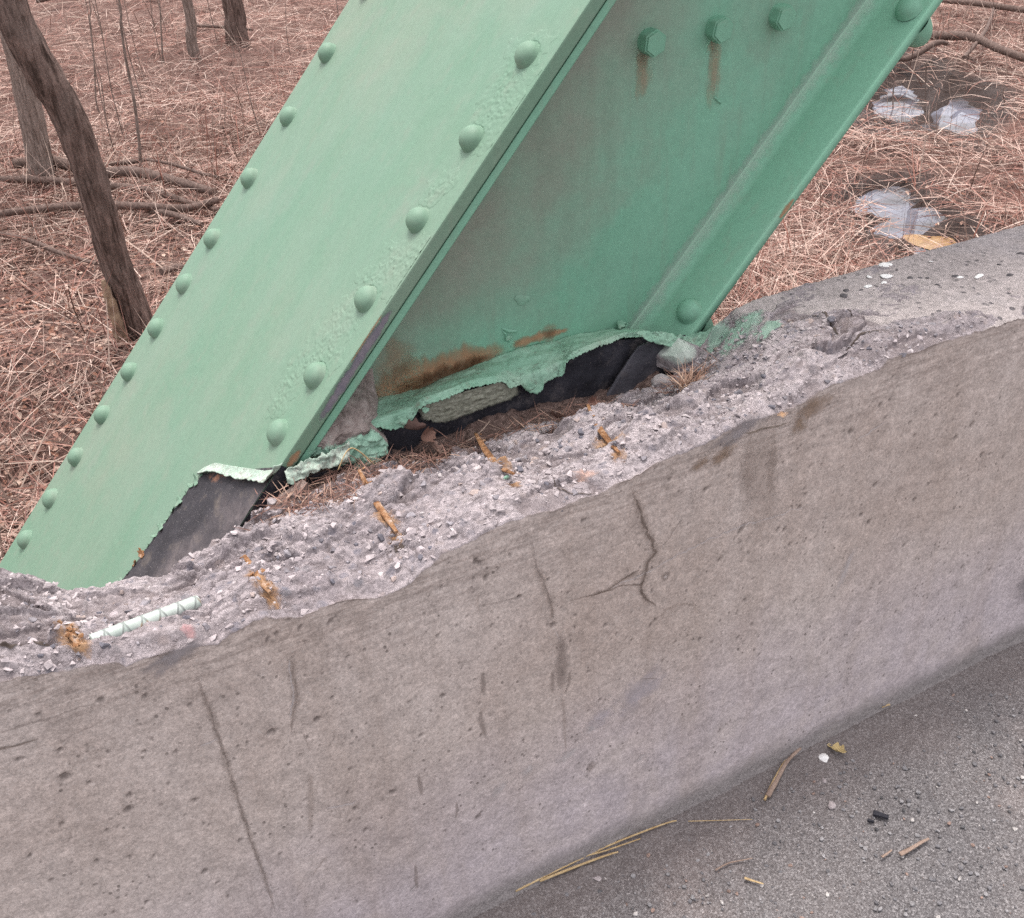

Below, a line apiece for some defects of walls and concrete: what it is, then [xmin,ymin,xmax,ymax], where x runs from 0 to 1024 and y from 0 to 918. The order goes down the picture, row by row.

rust [375,346,498,396]
rust [515,329,566,346]
spalling [0,257,1024,683]
crack [575,499,657,605]